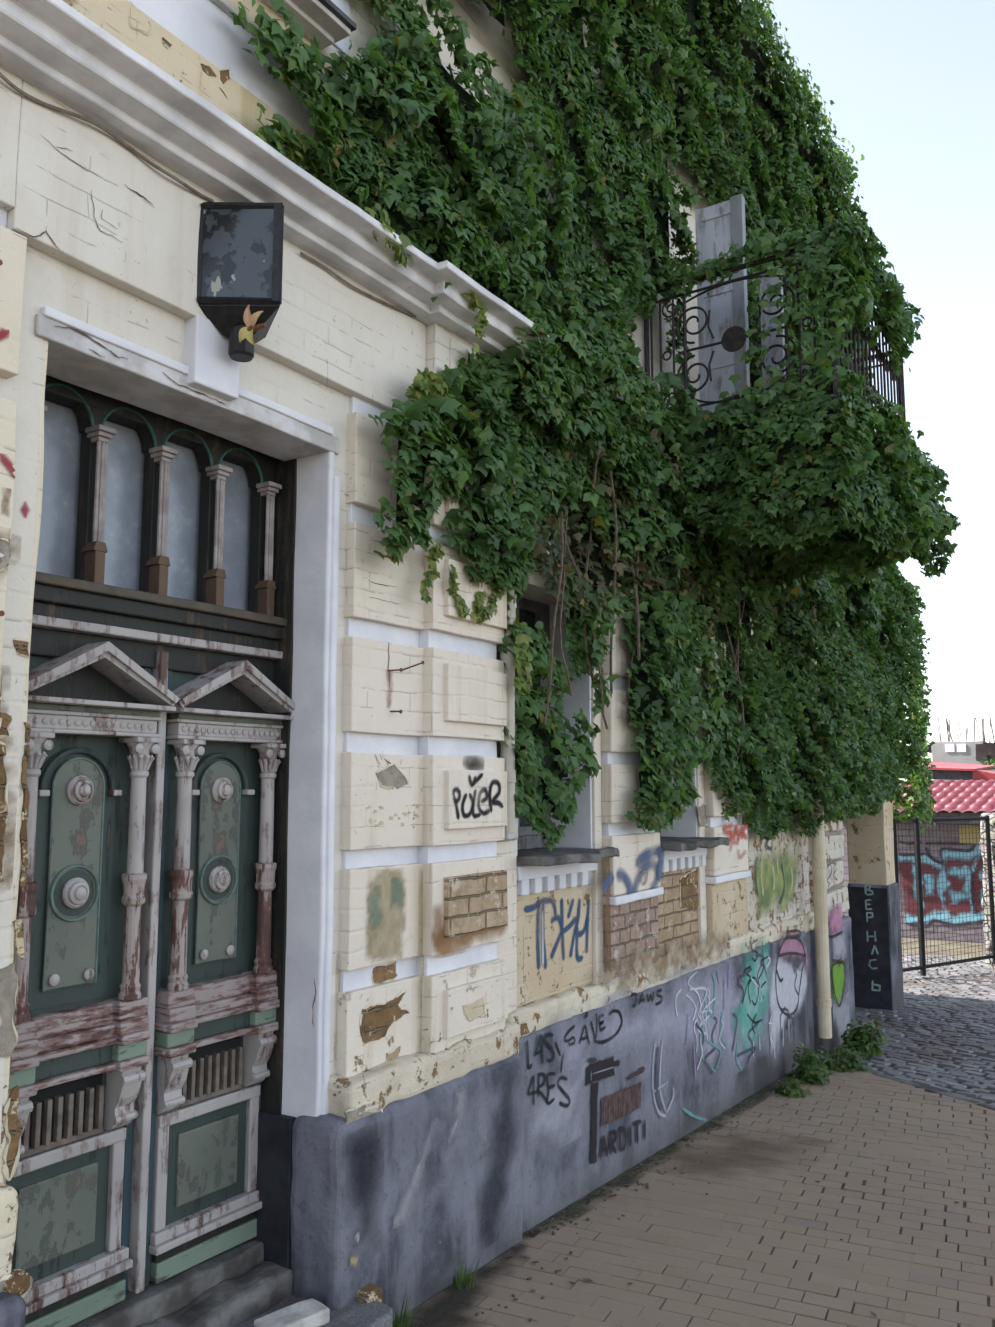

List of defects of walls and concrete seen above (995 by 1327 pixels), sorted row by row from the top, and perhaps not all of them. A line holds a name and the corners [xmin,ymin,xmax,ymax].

peeling [0,688,31,887]
spalling [0,917,24,1058]
spalling [2,1085,22,1181]
leakage [352,1138,378,1222]
leakage [393,1137,430,1226]
leakage [484,1091,513,1237]